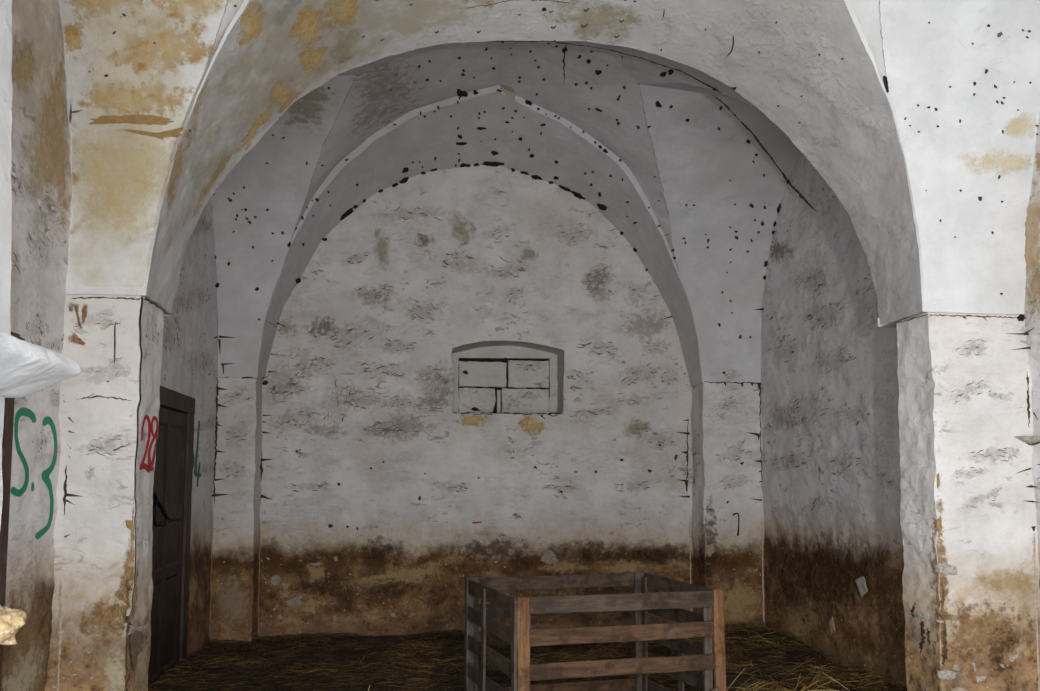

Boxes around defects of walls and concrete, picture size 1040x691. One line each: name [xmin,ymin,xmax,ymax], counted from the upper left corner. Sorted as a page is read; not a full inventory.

water stain [64,0,222,116]
water stain [239,1,264,44]
water stain [290,0,358,75]
water stain [35,64,154,224]
water stain [168,149,185,206]
water stain [237,79,300,151]
water stain [288,539,528,598]
water stain [539,541,685,573]
water stain [2,586,50,691]
water stain [100,622,149,691]